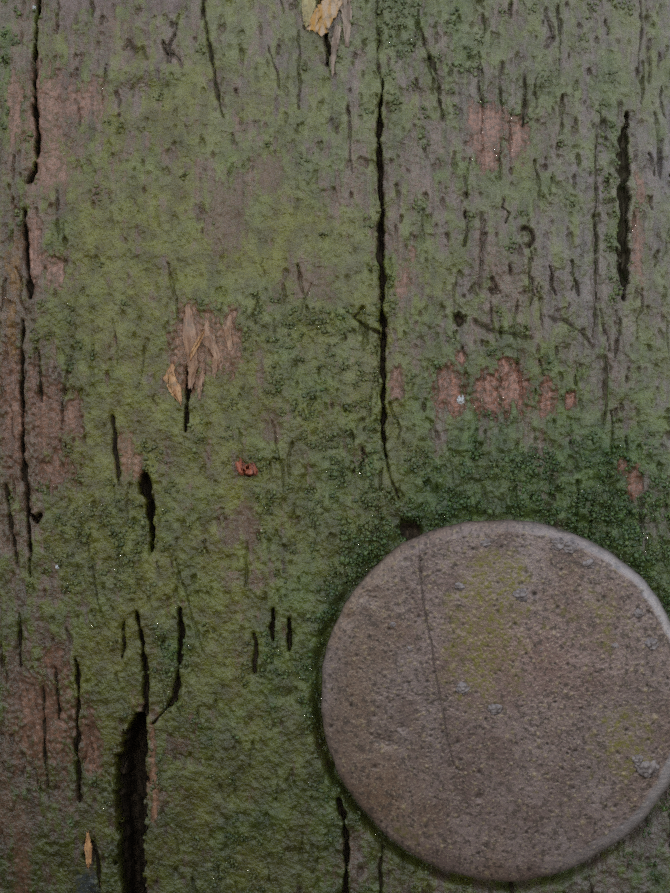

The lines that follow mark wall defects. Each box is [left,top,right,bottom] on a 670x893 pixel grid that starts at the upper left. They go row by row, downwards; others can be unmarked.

peeling [302,0,342,37]
crack [30,1,41,184]
crack [23,210,34,299]
crack [354,29,400,499]
crack [551,115,630,424]
peeling [163,302,243,406]
crack [5,329,43,574]
crack [112,416,121,481]
crack [140,473,156,550]
crack [118,608,185,893]
crack [337,798,349,893]
crack [377,844,385,893]